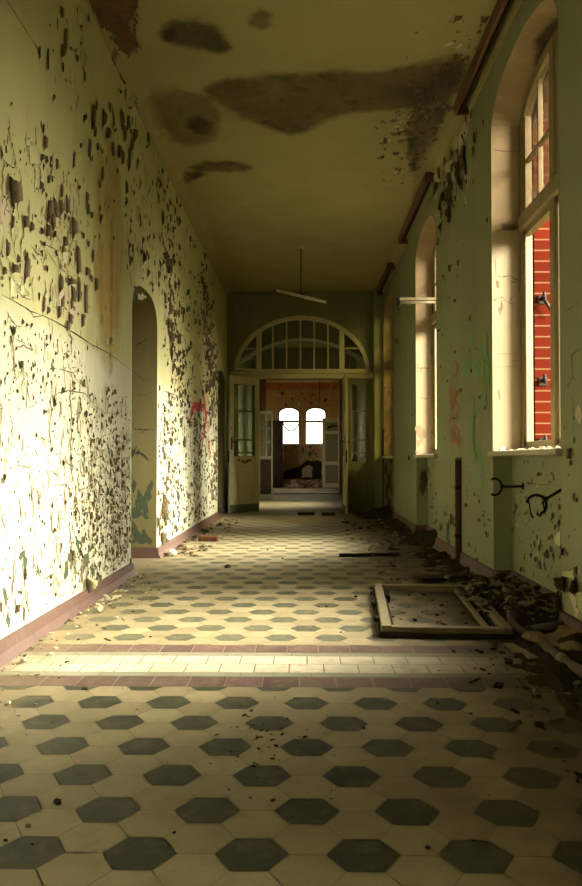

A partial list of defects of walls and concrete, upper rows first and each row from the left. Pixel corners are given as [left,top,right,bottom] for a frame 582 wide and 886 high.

water stain [164,21,225,50]
water stain [187,161,250,181]
water stain [207,60,464,170]
peeling [374,15,490,246]
crack [1,294,194,404]
peeling [0,0,220,629]
peeling [566,437,576,477]
peeling [511,460,582,621]